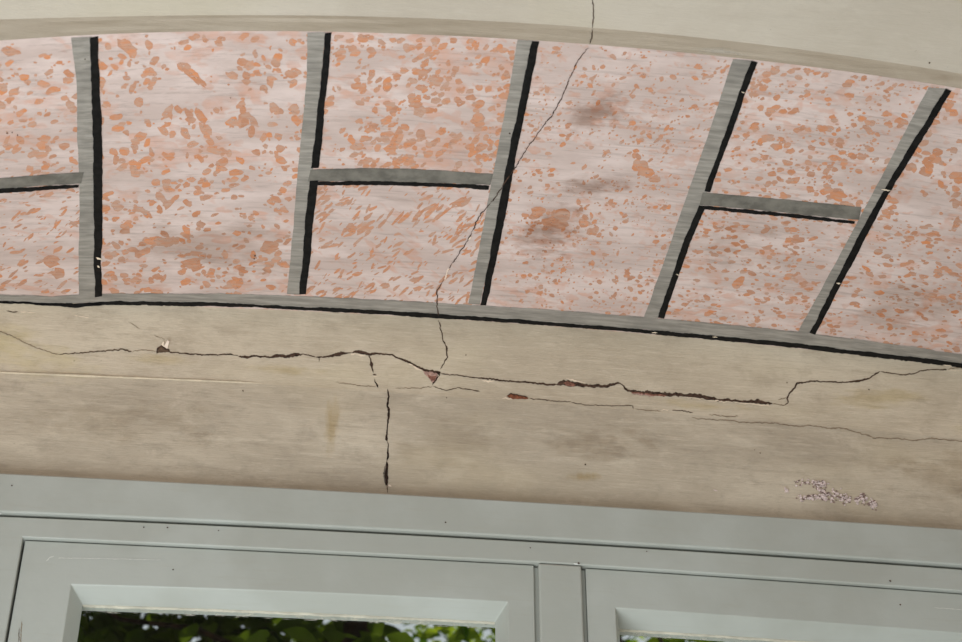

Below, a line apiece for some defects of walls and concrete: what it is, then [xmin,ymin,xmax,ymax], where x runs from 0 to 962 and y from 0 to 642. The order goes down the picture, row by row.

crack [0,0,962,493]
peeling [784,478,878,511]